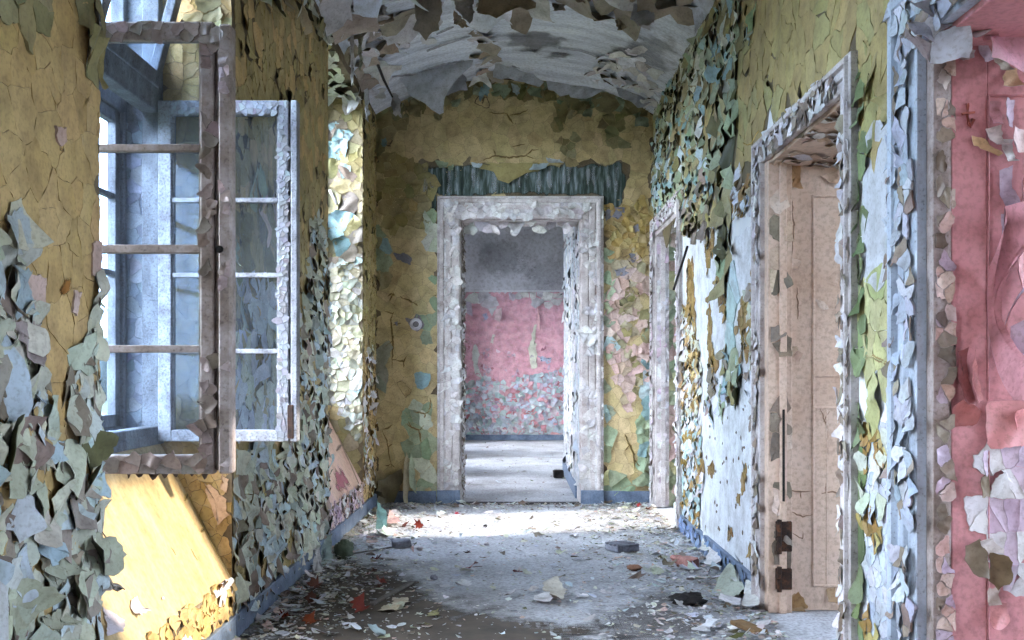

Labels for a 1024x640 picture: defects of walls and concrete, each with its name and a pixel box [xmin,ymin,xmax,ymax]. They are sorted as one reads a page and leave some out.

peeling [0,197,178,640]
peeling [169,0,918,640]
peeling [870,0,1024,206]
peeling [935,97,1024,640]